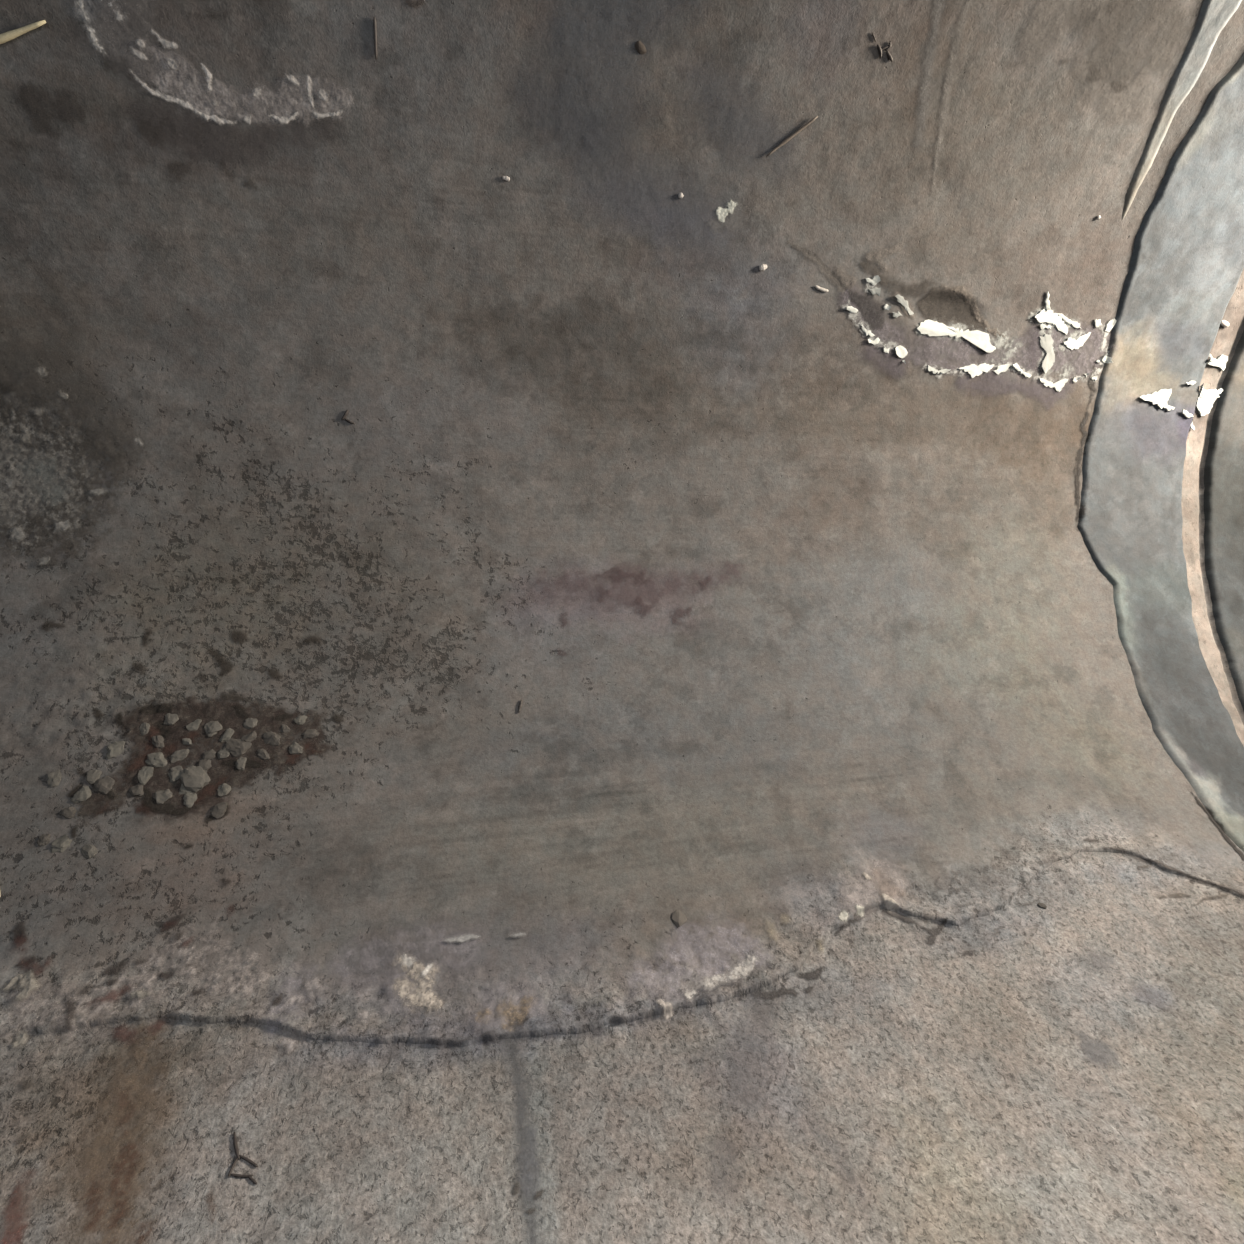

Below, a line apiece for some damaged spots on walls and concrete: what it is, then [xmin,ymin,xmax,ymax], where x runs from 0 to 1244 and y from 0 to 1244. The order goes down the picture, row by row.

water stain [73,0,352,168]
peeling [815,244,1117,402]
crack [1074,365,1098,526]
peeling [1139,381,1223,430]
peeling [1207,354,1228,371]